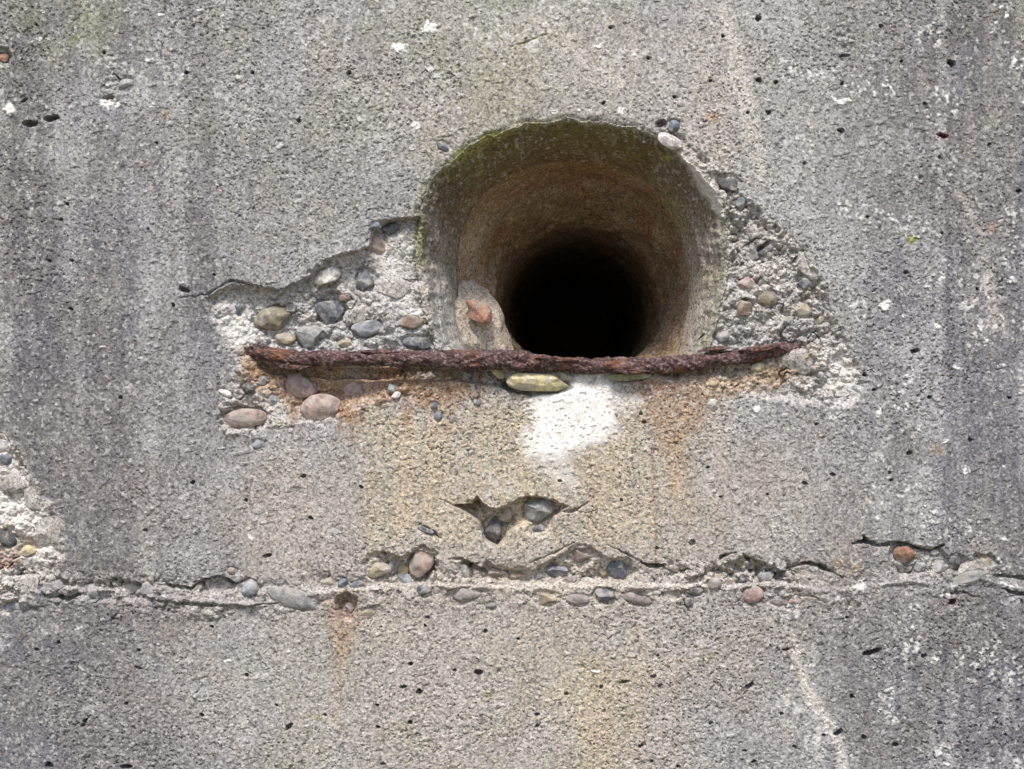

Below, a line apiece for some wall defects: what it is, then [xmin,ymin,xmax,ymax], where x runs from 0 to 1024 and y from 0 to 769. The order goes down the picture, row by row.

crack [180,279,299,299]
spalling [204,215,437,438]
crack [0,524,1024,618]
corrosion [238,342,827,560]
leakage [348,374,726,581]
spalling [456,494,640,586]
leakage [540,371,580,382]
spalling [655,118,877,411]